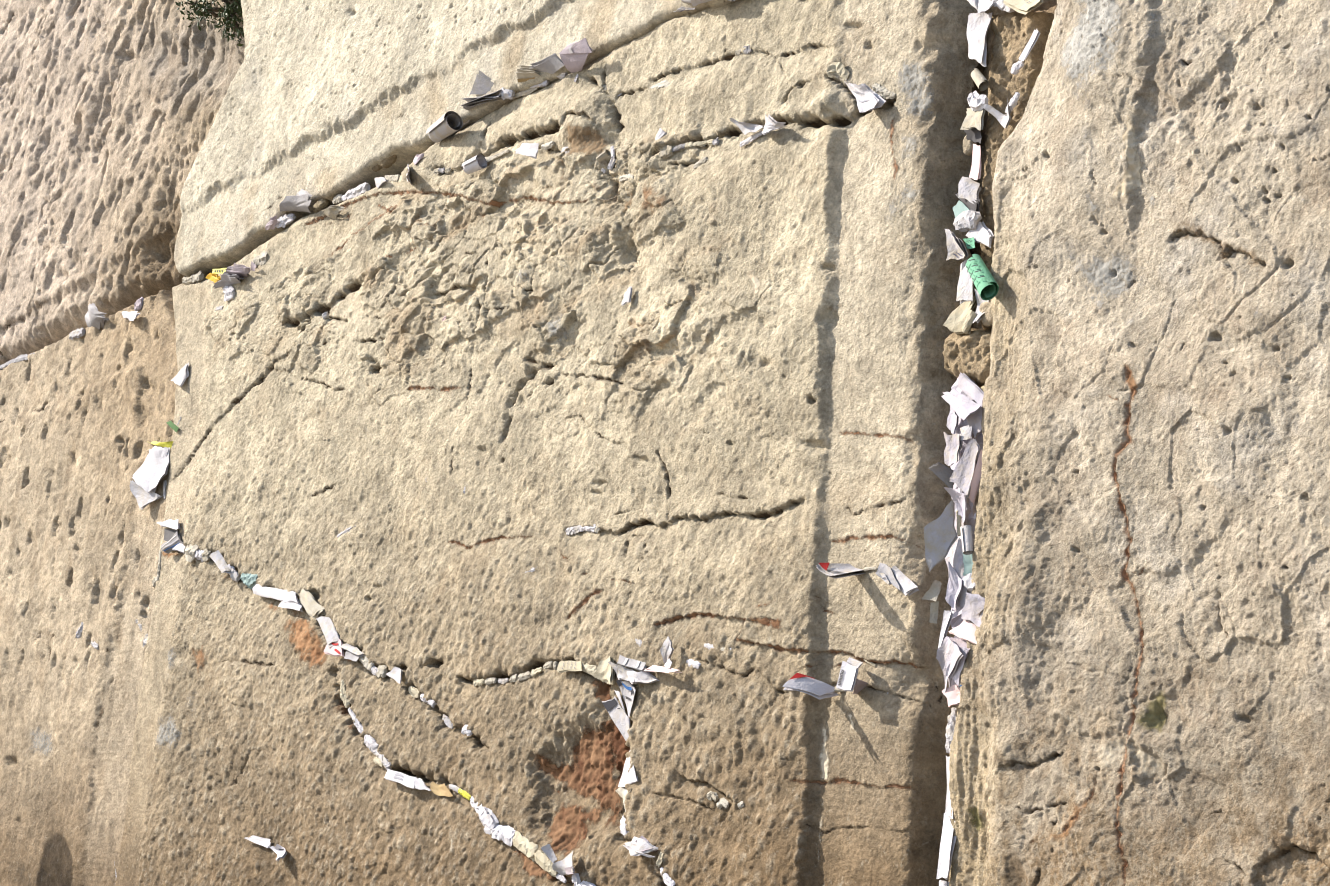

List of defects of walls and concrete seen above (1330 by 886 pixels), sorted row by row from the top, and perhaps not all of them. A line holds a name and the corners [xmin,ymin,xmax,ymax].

crack [449,536,532,549]
crack [568,451,797,619]
corrosion [592,677,611,701]
crack [1031,366,1144,879]
corrosion [536,719,630,855]